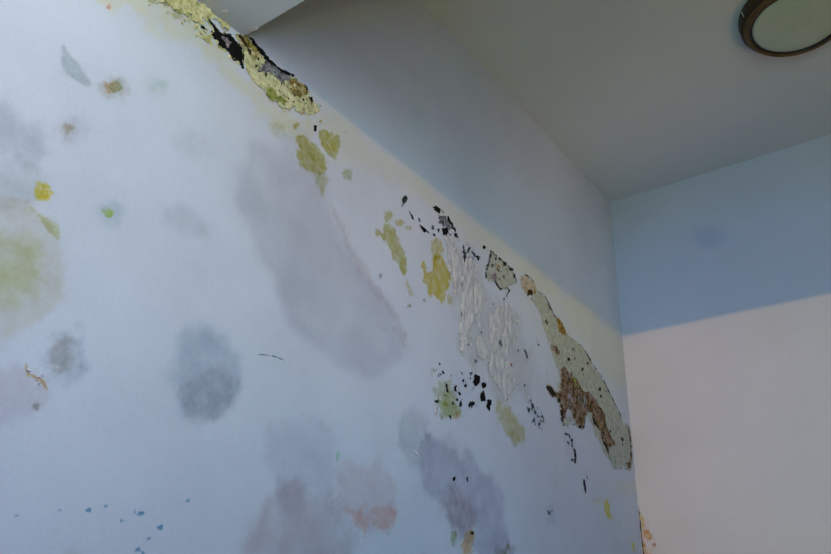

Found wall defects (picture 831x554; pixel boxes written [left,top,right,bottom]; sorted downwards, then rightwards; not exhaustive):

flaking render [148,0,322,132]
flaking render [402,196,633,472]